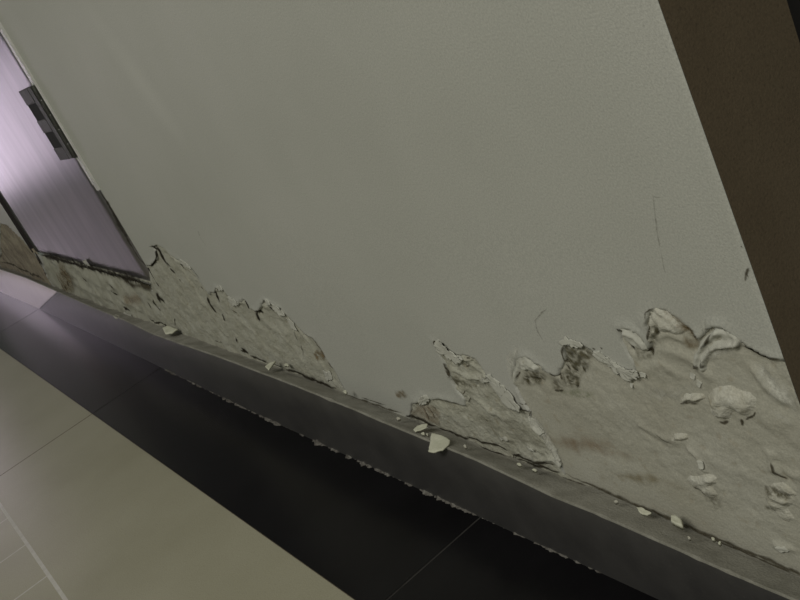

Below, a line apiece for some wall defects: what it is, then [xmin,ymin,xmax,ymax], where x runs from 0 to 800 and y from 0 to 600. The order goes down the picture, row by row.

peeling [43,245,344,392]
peeling [411,309,800,575]